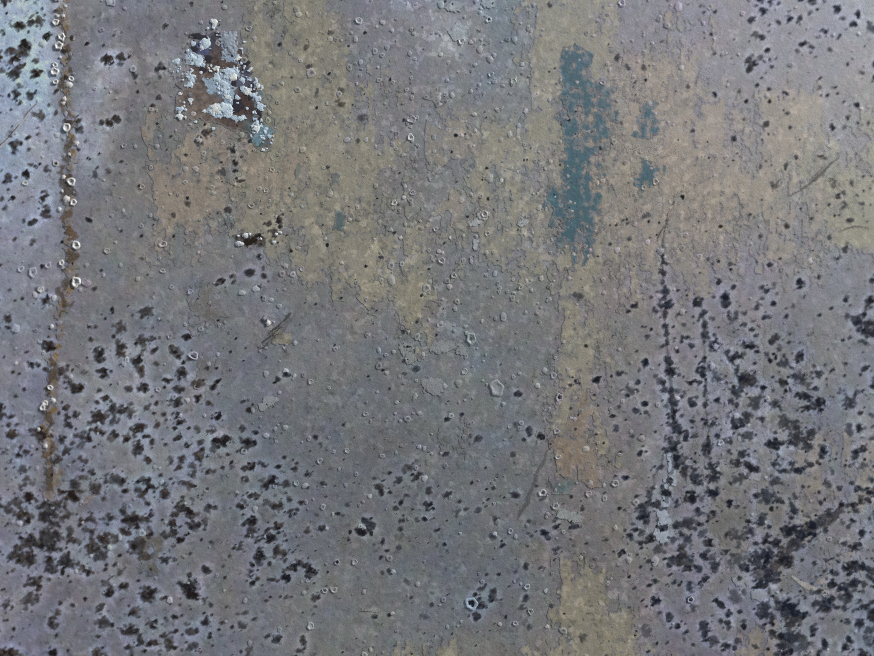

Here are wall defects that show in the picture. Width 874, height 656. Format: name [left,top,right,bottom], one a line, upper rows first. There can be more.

mould [748,0,817,40]
water stain [833,4,874,40]
water stain [0,0,53,114]
peeling [164,19,275,152]
water stain [7,103,91,154]
mould [1,162,58,183]
corrosion [38,0,81,507]
mould [842,295,874,345]
water stain [0,306,326,656]
mould [373,462,501,532]
mould [348,517,377,543]
mould [468,583,503,621]